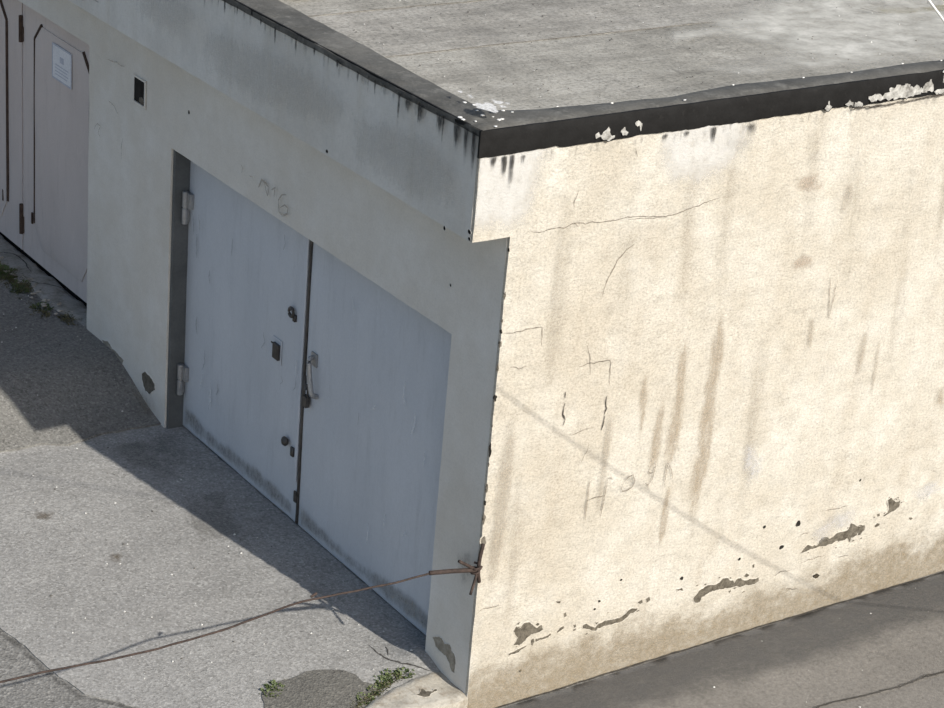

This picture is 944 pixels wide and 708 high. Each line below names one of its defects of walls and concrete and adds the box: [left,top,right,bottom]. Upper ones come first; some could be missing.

leakage [397,93,423,120]
peeling [595,119,643,142]
peeling [845,78,944,108]
leakage [438,115,543,223]
flaking render [800,496,903,554]
flaking render [676,563,759,604]
flaking render [508,596,651,656]
leakage [467,544,944,708]